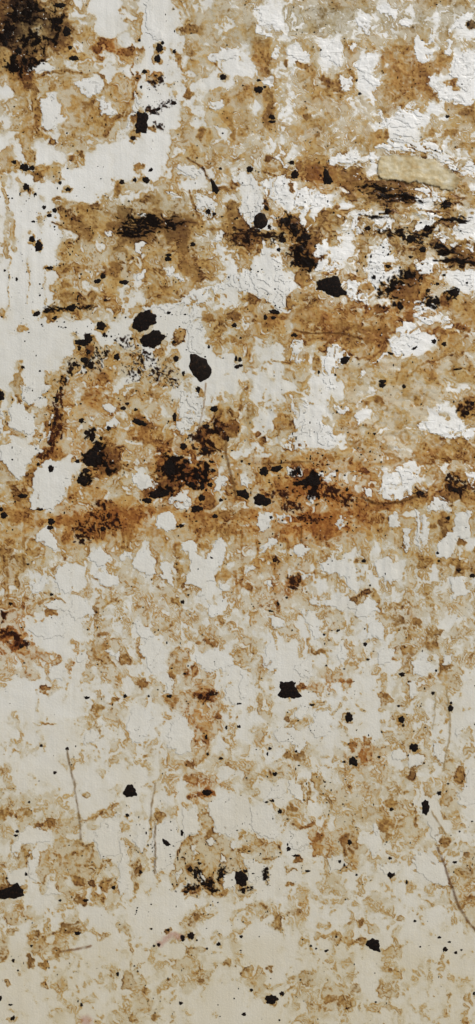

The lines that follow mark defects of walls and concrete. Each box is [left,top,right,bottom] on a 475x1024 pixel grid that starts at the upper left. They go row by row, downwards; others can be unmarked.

corrosion [0,0,475,742]
corrosion [0,643,255,918]
damp [0,871,475,1024]
corrosion [214,754,263,802]
damp [244,805,291,882]
corrosion [263,680,475,921]